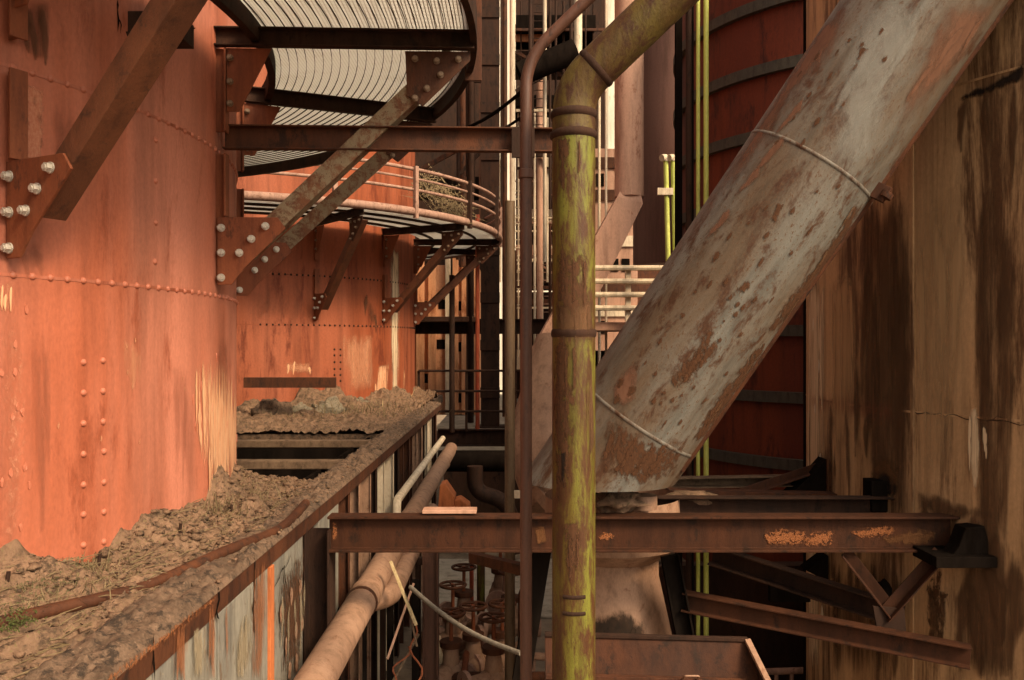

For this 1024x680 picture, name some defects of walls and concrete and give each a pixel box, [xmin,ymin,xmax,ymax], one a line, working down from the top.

peeling [192,353,236,491]
peeling [808,286,824,466]
crack [915,412,1024,426]
water stain [968,192,1014,555]